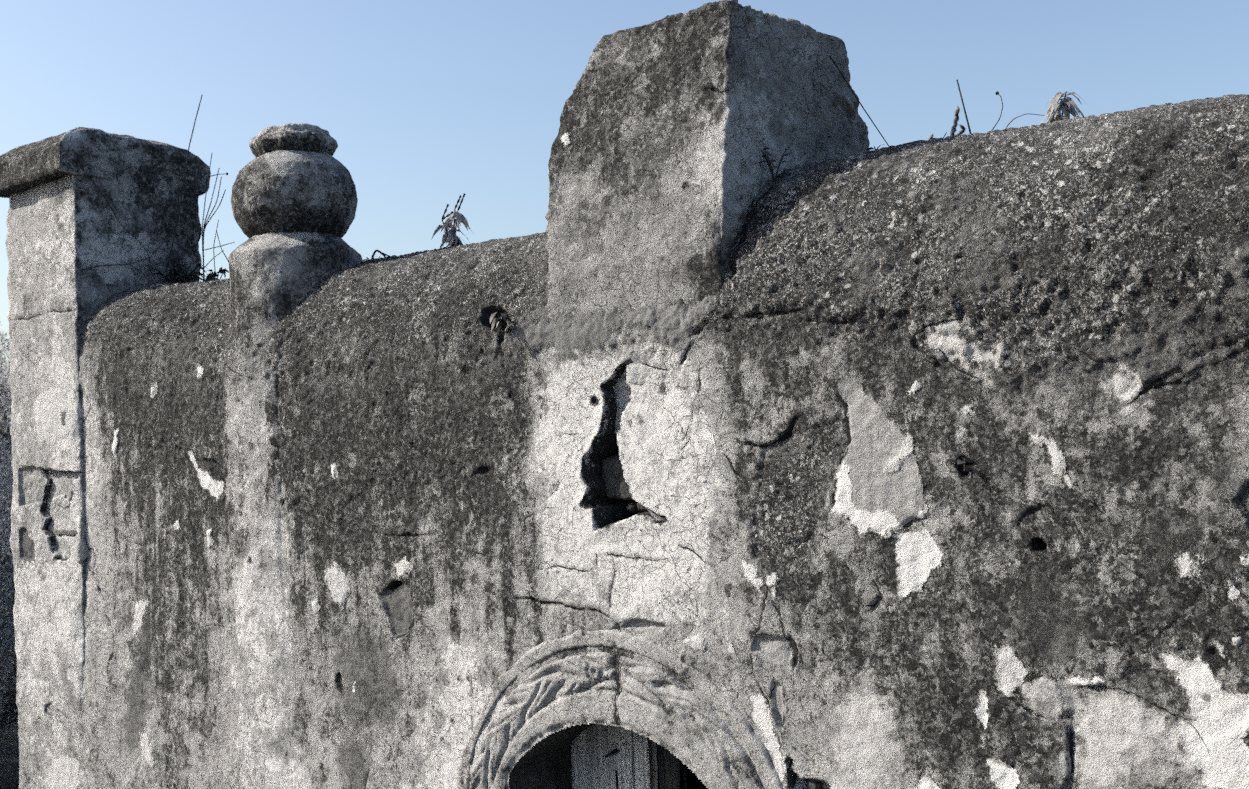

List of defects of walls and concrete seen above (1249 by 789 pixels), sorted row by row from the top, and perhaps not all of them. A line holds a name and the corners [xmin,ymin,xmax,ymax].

flaking render [627,363,665,393]
crack [1080,351,1120,362]
crack [1127,345,1249,404]
spalling [17,466,89,564]
flaking render [602,455,667,522]
flaking render [829,379,944,597]
flaking render [1226,580,1240,599]
crack [513,545,736,725]
flaking render [1057,637,1249,789]